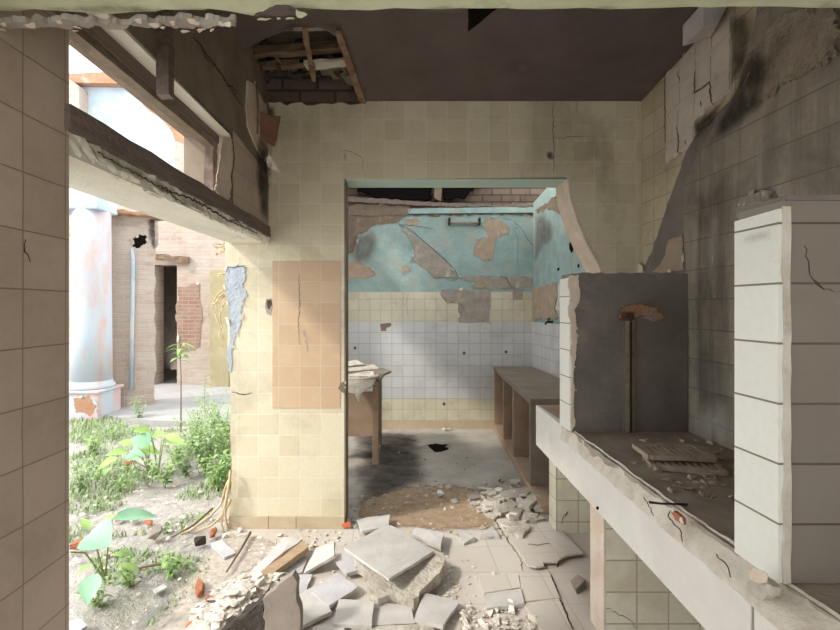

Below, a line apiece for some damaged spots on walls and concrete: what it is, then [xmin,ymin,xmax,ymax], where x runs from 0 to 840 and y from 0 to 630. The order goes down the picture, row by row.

crack [664,72,714,152]
peeling [665,7,840,164]
crack [97,138,258,234]
crack [804,246,834,292]
flaking render [175,282,203,352]
flaking render [223,263,248,373]
peeling [74,395,98,416]
spalling [348,175,840,630]
leakage [360,435,418,499]
crack [495,520,549,571]
crack [643,497,683,542]
crack [549,562,574,628]